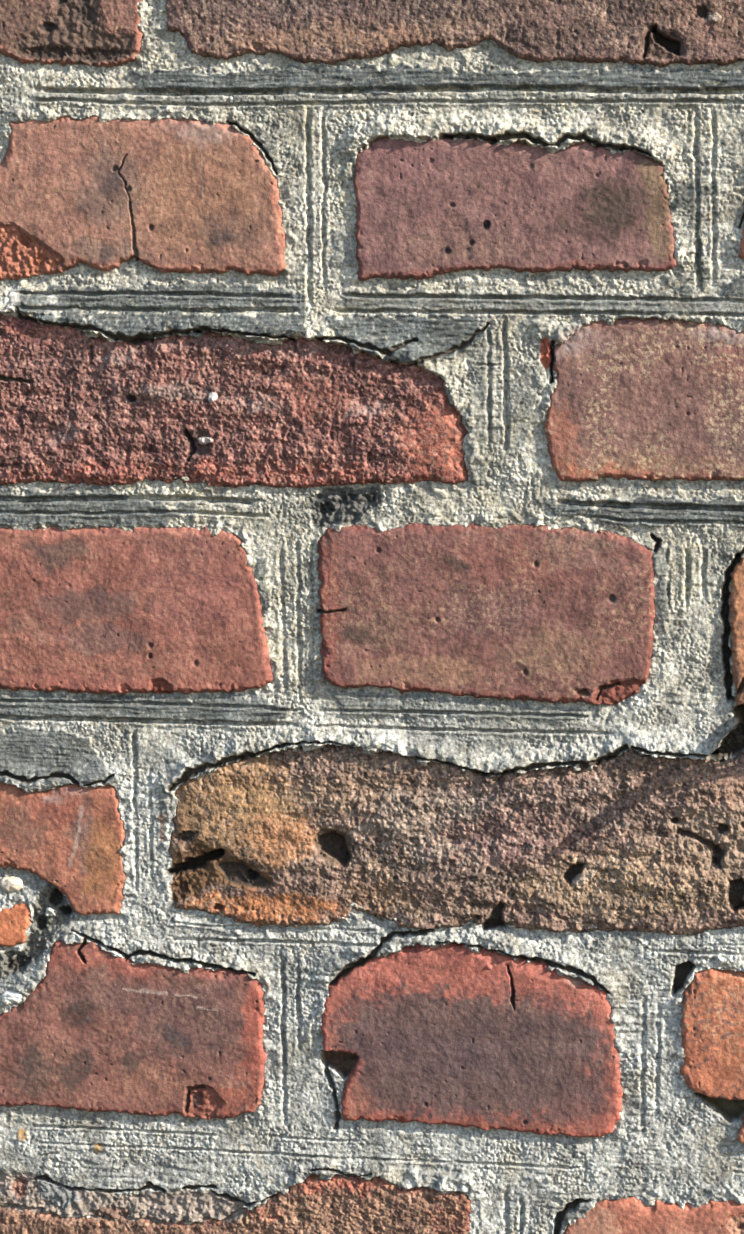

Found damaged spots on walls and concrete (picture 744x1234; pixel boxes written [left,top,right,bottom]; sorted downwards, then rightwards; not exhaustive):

crack [118,157,139,262]
crack [14,307,489,365]
spalling [164,831,277,911]
crack [72,929,256,977]
crack [328,929,609,1008]